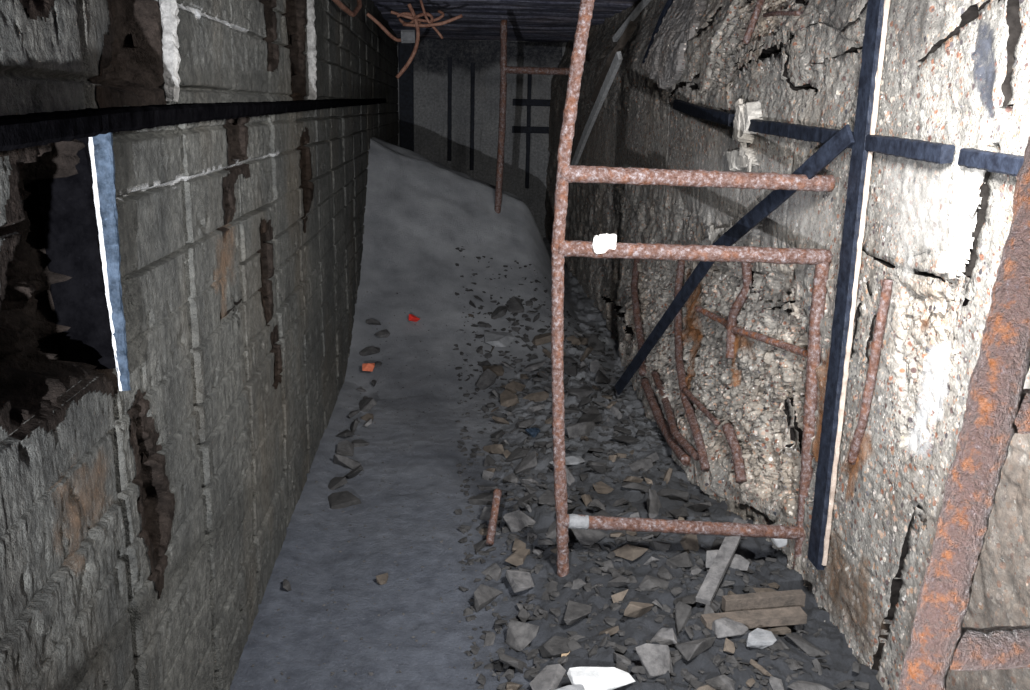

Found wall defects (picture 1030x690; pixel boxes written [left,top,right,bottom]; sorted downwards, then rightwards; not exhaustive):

spalling [19,0,55,22]
crack [666,0,868,103]
crack [917,0,1026,108]
spalling [0,139,119,441]
spalling [127,389,175,599]